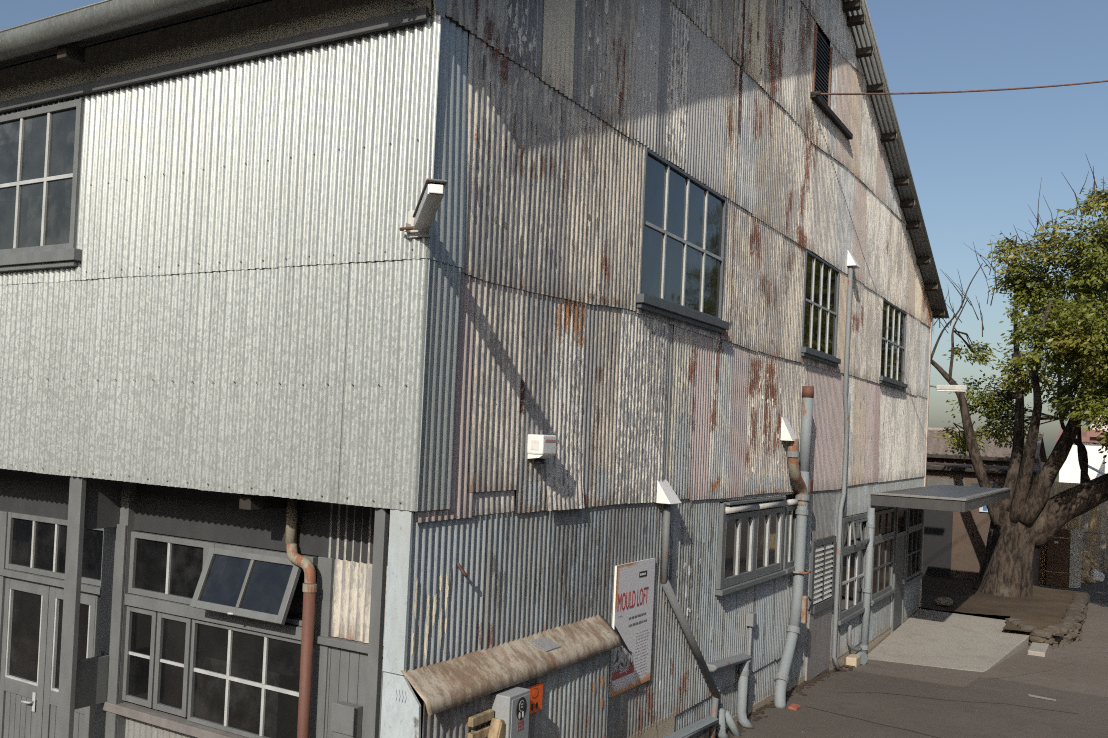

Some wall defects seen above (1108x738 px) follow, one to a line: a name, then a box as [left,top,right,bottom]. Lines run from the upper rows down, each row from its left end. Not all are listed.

peeling [506,3,536,90]
corrosion [728,0,783,144]
corrosion [760,107,819,308]
corrosion [544,294,620,353]
corrosion [745,357,782,467]